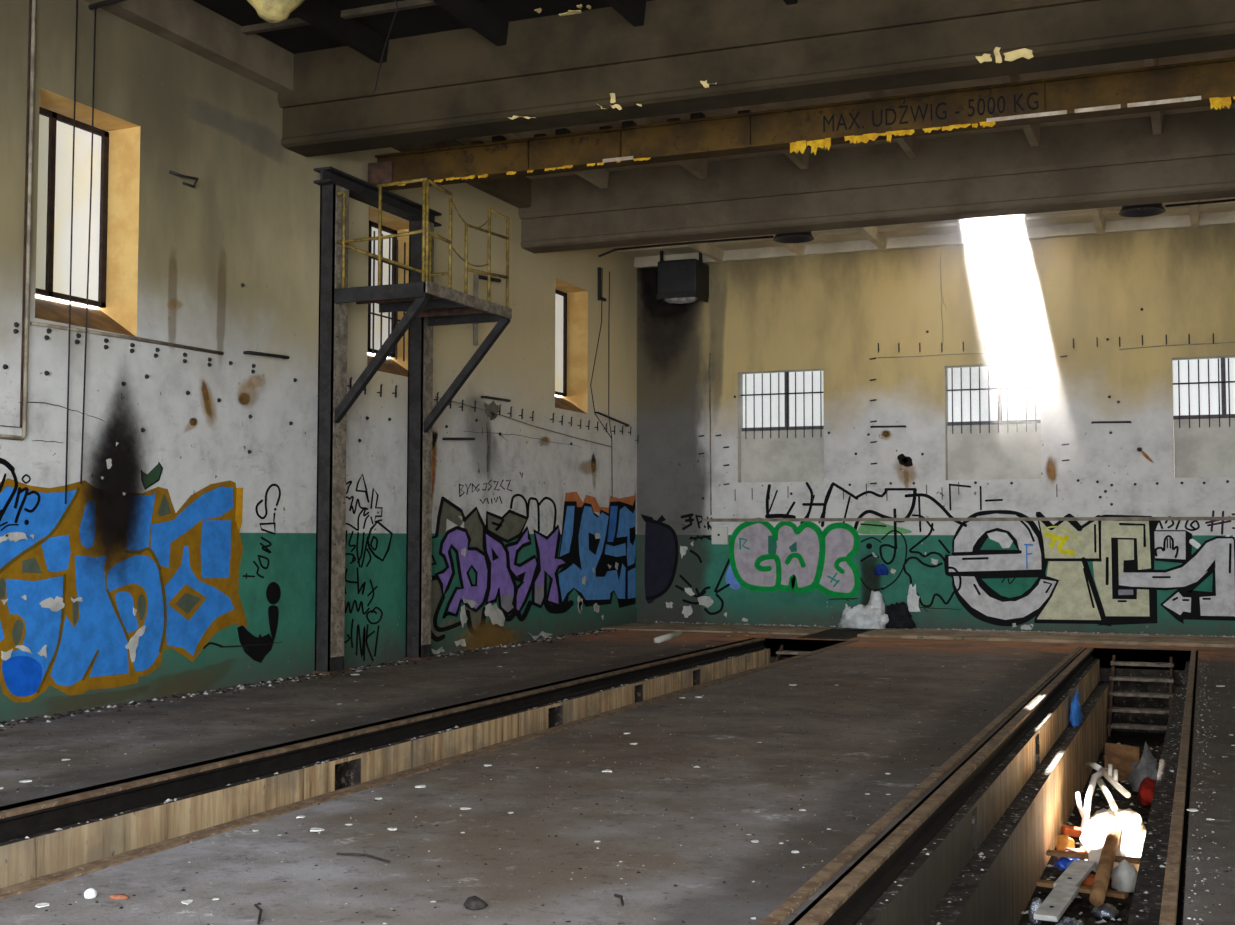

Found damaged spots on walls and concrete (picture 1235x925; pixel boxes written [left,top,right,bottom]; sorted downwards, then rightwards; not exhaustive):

peeling [975,47,1034,64]
peeling [599,93,642,110]
peeling [1209,96,1235,110]
peeling [790,121,996,155]
peeling [506,157,651,175]
corrosion [189,382,212,426]
peeling [0,532,34,543]
peeling [1,595,82,612]
peeling [666,588,714,618]
peeling [125,608,146,662]
peeling [432,596,505,654]
spalling [0,638,846,888]